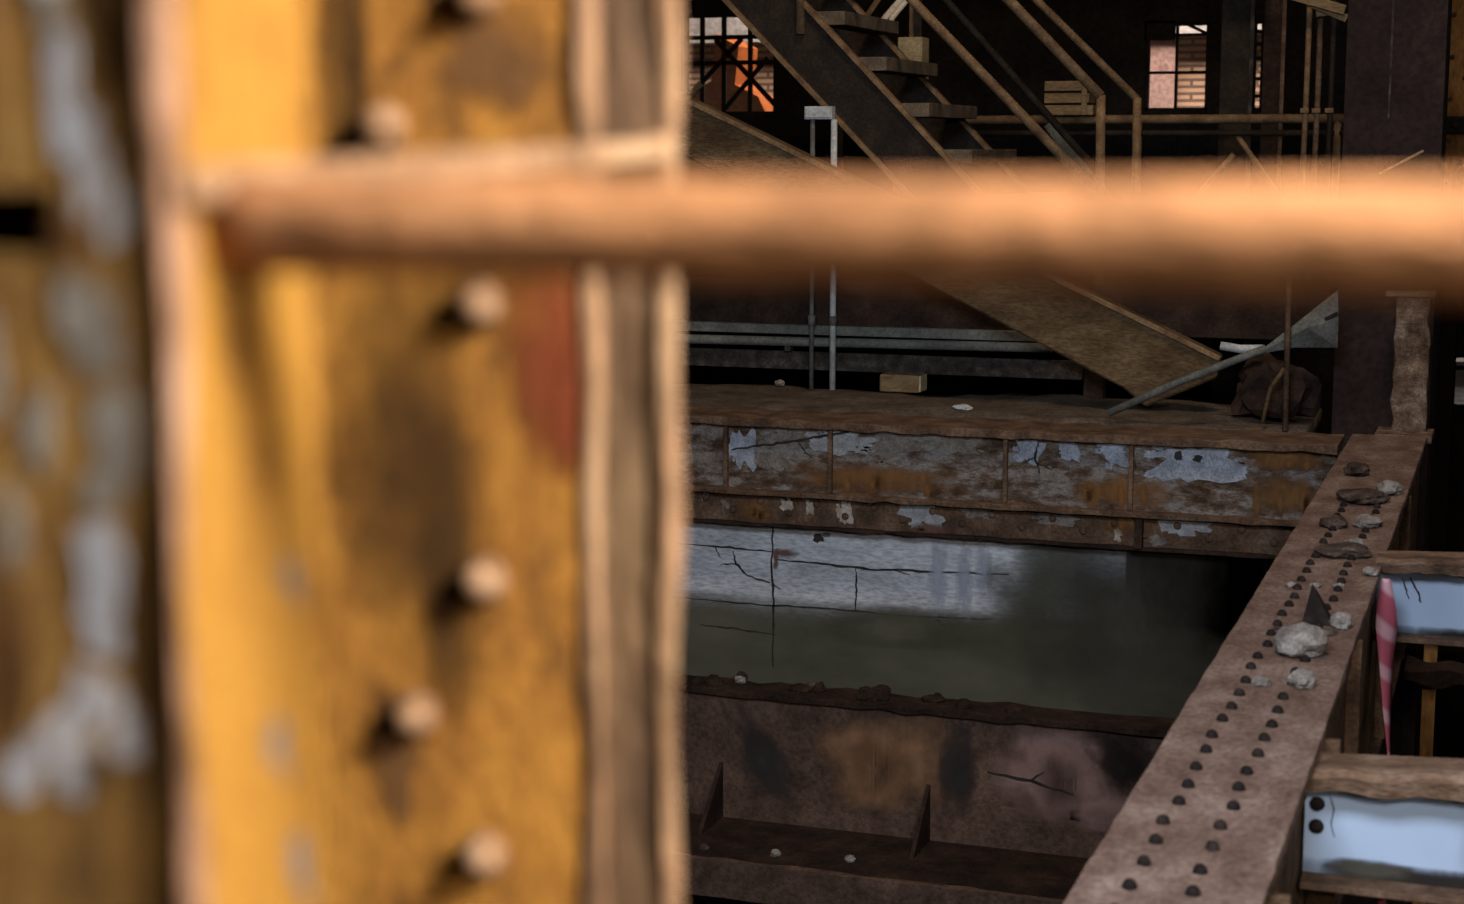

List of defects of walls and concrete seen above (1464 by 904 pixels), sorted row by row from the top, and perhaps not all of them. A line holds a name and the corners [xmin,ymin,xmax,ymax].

peeling [689,423,879,472]
peeling [1012,439,1255,483]
peeling [780,498,814,515]
peeling [813,500,854,543]
peeling [896,504,946,528]
peeling [1032,512,1080,527]
crack [684,527,1009,667]
corrosion [995,732,1125,829]